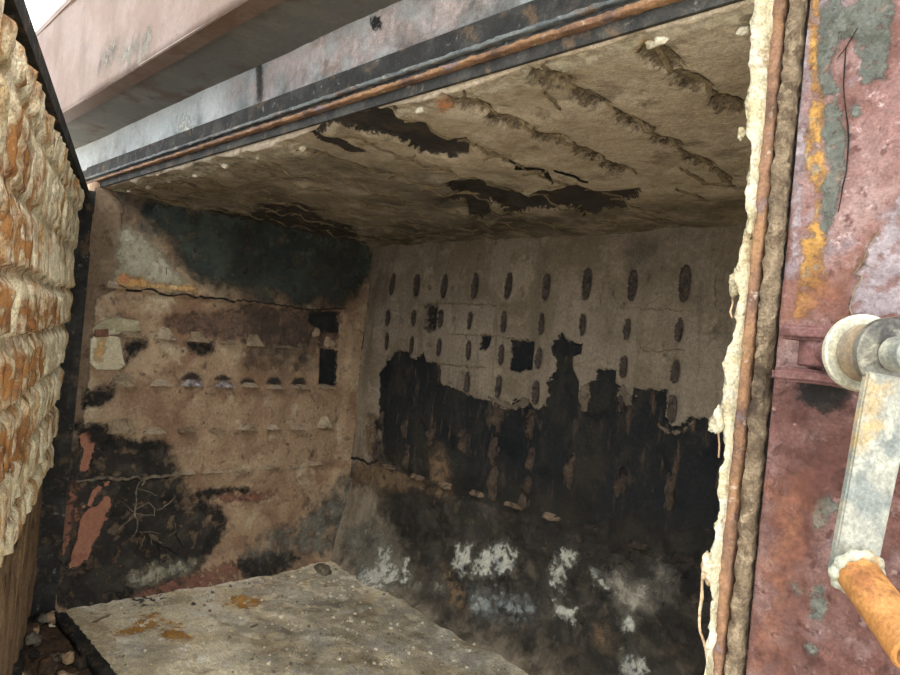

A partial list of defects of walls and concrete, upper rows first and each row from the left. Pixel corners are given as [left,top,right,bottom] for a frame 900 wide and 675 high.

rust [298,0,486,74]
spalling [312,105,469,158]
rust [791,0,849,318]
crack [102,268,346,311]
peeling [351,0,774,675]
peeling [62,481,111,569]
crack [76,472,185,555]
water stain [129,501,227,585]
efflorescence [451,542,518,578]
efflorescence [549,549,578,588]
rust [751,407,900,675]
efflorescence [555,605,578,625]